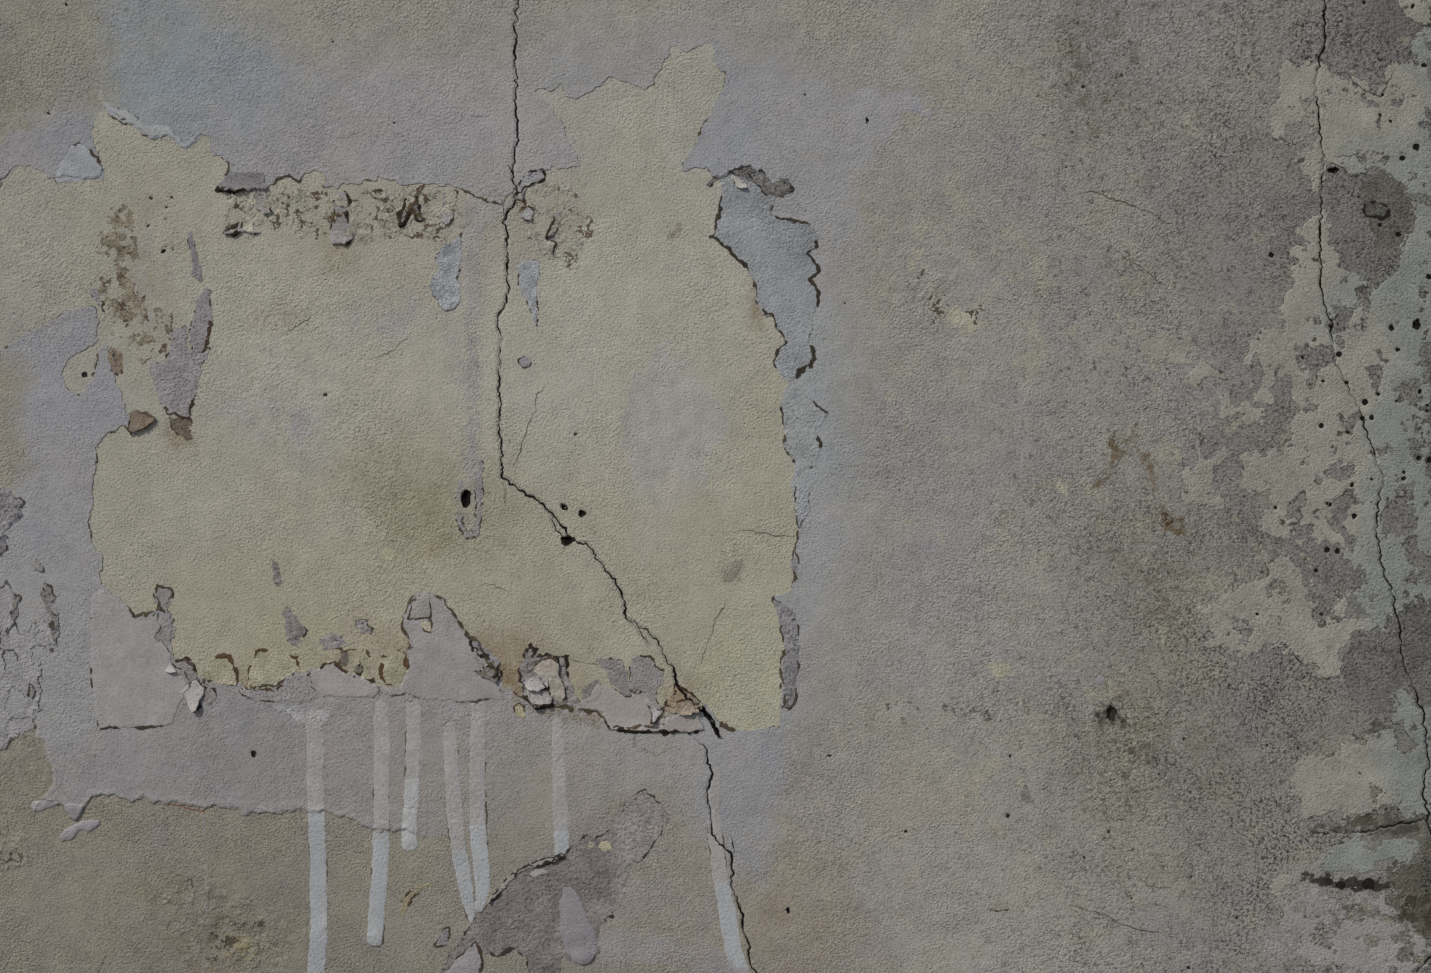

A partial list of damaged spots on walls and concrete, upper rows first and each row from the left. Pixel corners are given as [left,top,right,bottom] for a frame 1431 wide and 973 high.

peeling [0,43,828,750]
peeling [433,788,669,973]
crack [472,0,757,973]
peeling [1140,0,1431,973]
crack [1289,0,1431,838]